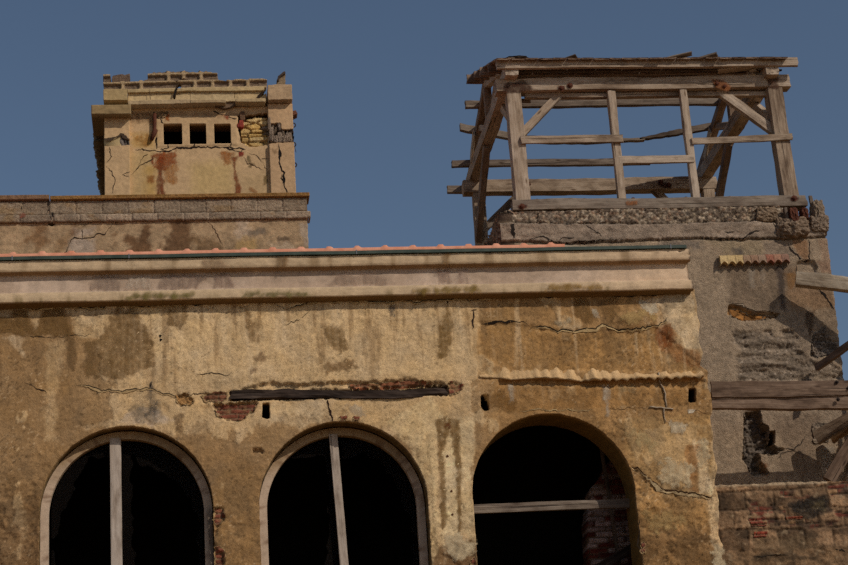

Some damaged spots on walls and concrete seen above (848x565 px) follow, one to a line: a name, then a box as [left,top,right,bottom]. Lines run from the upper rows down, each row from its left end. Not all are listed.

spalling [237,111,294,147]
rust [149,152,176,194]
crack [106,117,287,191]
rust [221,151,243,193]
crack [277,299,667,333]
damp [0,308,76,369]
damp [85,307,153,378]
crack [75,372,232,397]
spalling [176,391,257,421]
spalling [349,379,465,396]
spalling [742,410,781,476]
damp [436,417,461,531]